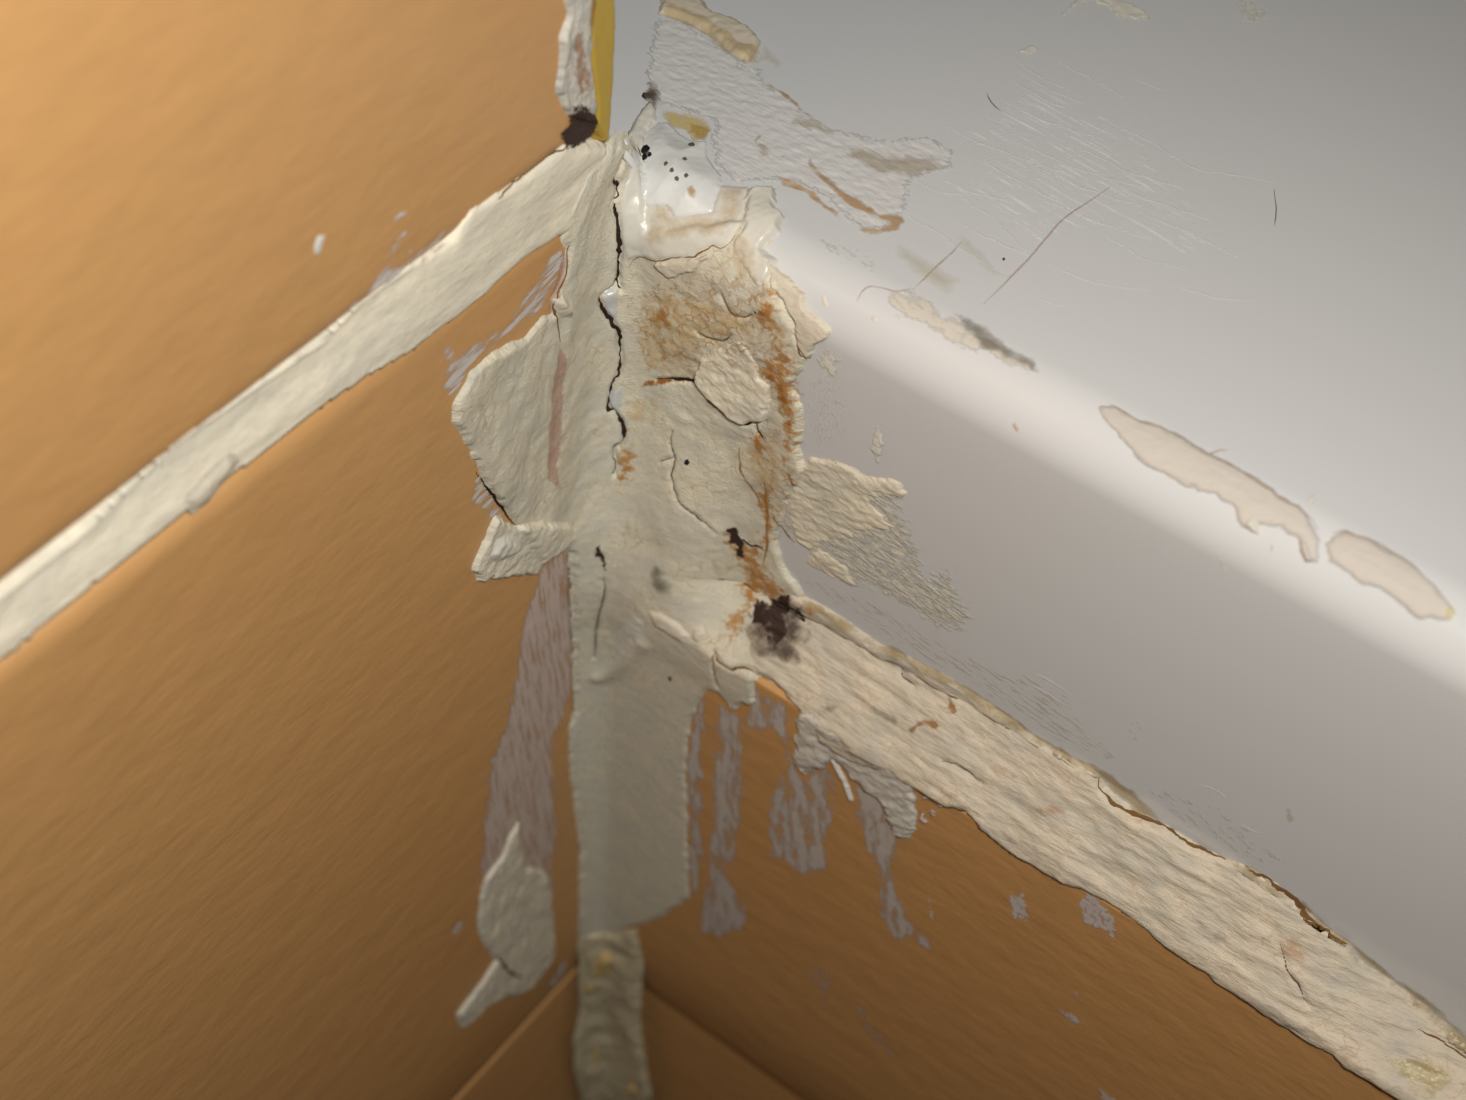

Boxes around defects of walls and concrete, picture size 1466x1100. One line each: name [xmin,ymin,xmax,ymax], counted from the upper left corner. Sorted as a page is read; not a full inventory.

crack [498,148,569,199]
peeling [623,122,722,218]
crack [552,245,570,342]
crack [598,179,735,474]
crack [697,295,755,341]
crack [657,377,761,434]
peeling [694,342,771,425]
peeling [184,452,240,515]
crack [660,430,715,532]
rust [643,288,801,637]
peeling [471,515,577,582]
peeling [1300,541,1313,562]